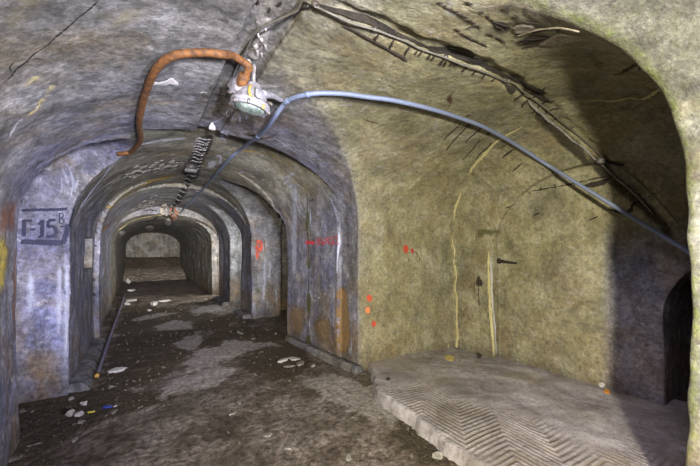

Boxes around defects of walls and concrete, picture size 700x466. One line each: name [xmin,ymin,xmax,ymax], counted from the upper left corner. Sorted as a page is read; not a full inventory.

crack [3,1,98,84]
rust [315,288,350,352]